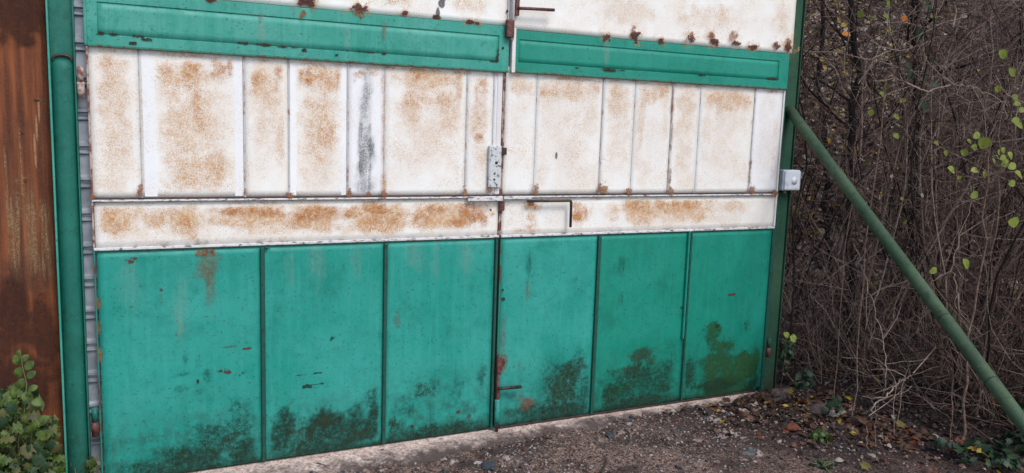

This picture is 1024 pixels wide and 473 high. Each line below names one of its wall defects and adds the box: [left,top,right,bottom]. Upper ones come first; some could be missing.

rust [709,30,759,50]
rust [163,63,232,186]
rust [300,68,338,162]
water stain [359,123,374,191]
rust [101,184,334,239]
rust [346,180,493,234]
rust [614,171,711,225]
rust [0,131,59,412]